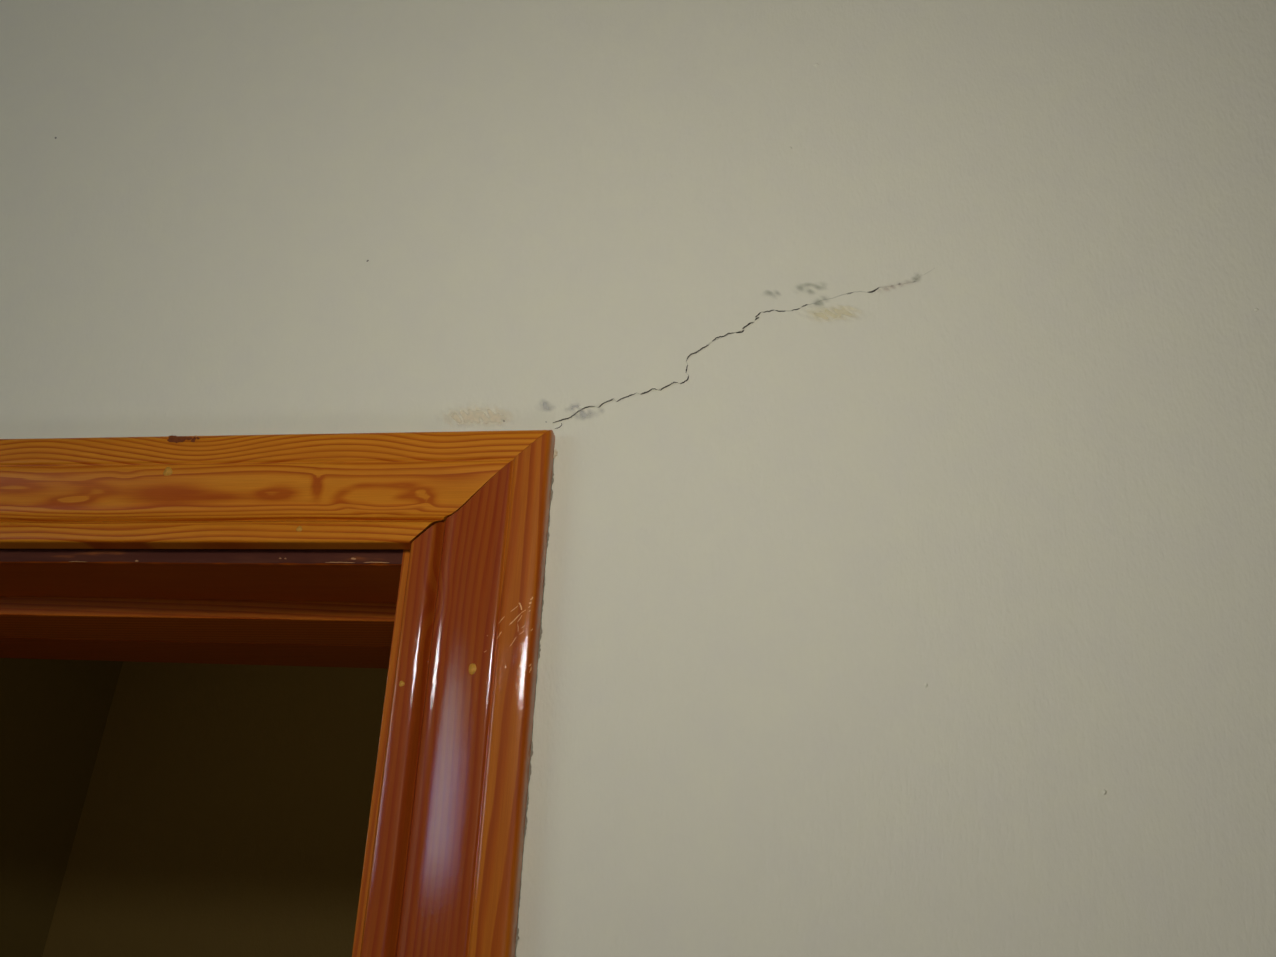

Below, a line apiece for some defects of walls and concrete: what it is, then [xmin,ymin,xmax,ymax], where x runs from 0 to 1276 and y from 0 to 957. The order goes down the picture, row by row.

crack [553,271,930,429]